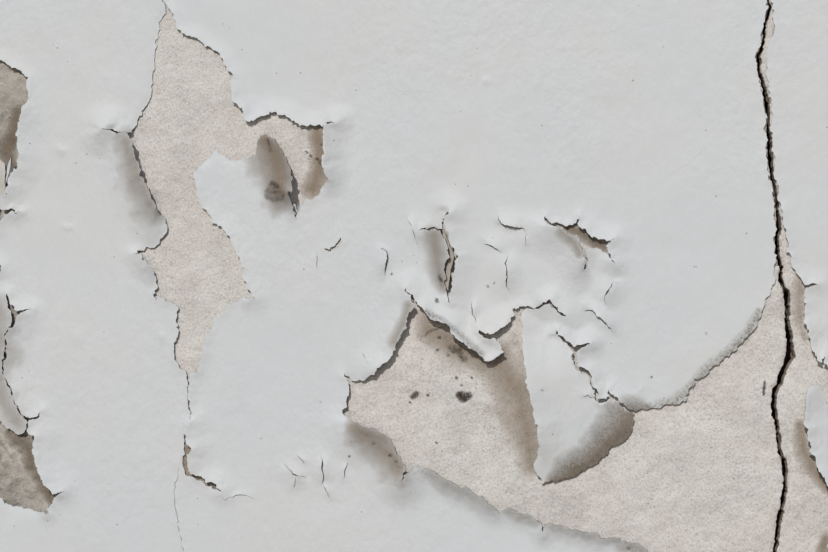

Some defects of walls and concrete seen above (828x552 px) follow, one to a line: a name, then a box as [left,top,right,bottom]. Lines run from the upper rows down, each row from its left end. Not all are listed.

peeling [0,47,50,243]
peeling [0,279,83,528]
crack [171,474,192,552]
peeling [74,0,358,512]
peeling [315,184,828,552]
crack [747,0,809,552]